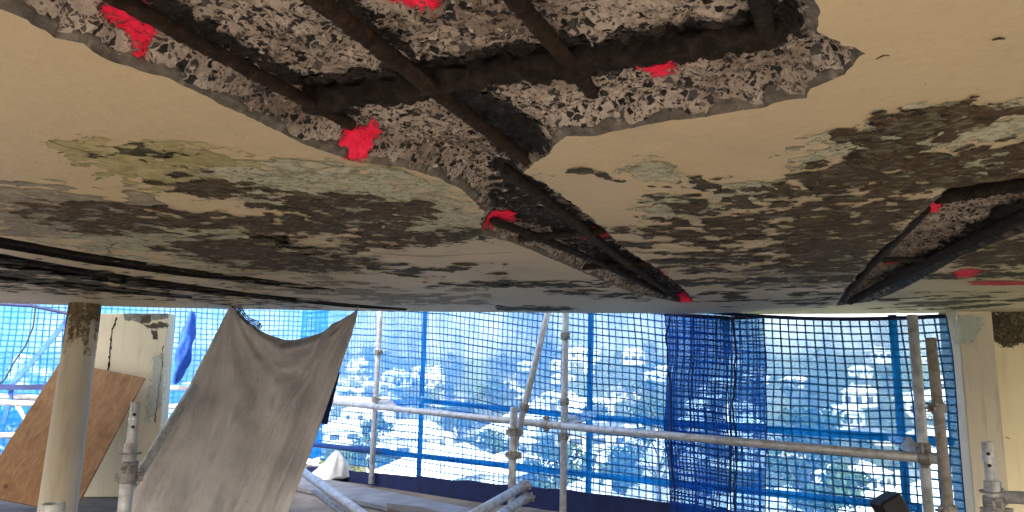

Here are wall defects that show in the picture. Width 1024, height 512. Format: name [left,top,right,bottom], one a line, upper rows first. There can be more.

spalling [0,0,1024,310]
crack [107,317,117,371]
damp [673,265,863,308]
damp [869,234,1024,349]